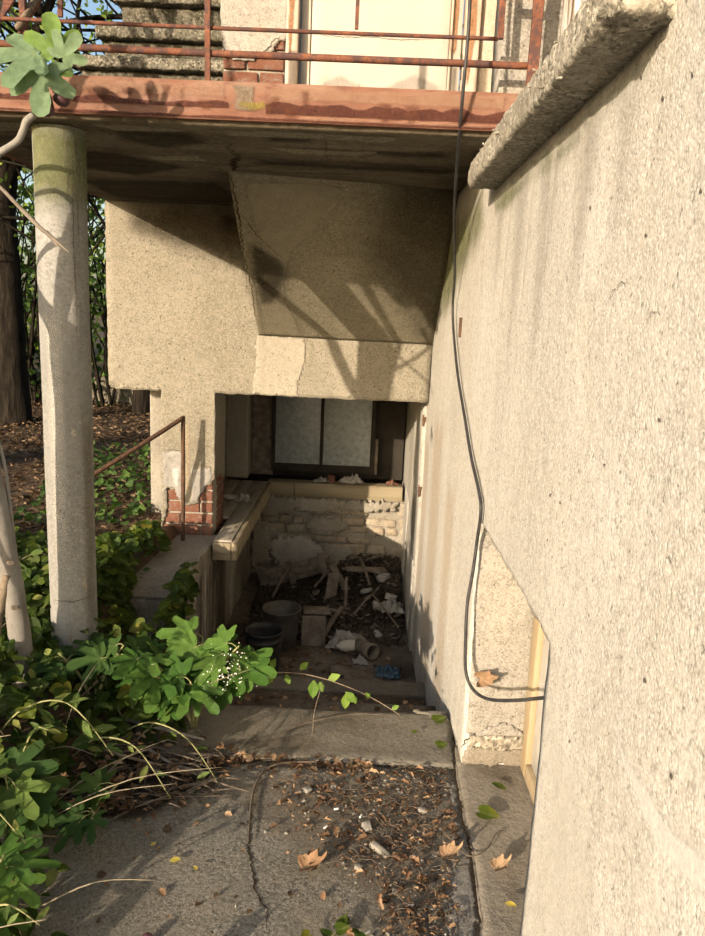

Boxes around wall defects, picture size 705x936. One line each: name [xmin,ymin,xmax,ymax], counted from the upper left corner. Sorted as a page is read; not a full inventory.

rust [466,0,477,81]
rust [0,93,31,110]
rust [51,90,506,130]
leakage [121,132,200,146]
leakage [86,152,283,302]
leakage [384,186,460,322]
flaking render [161,449,213,504]
spalling [462,733,523,767]
crack [216,756,299,935]